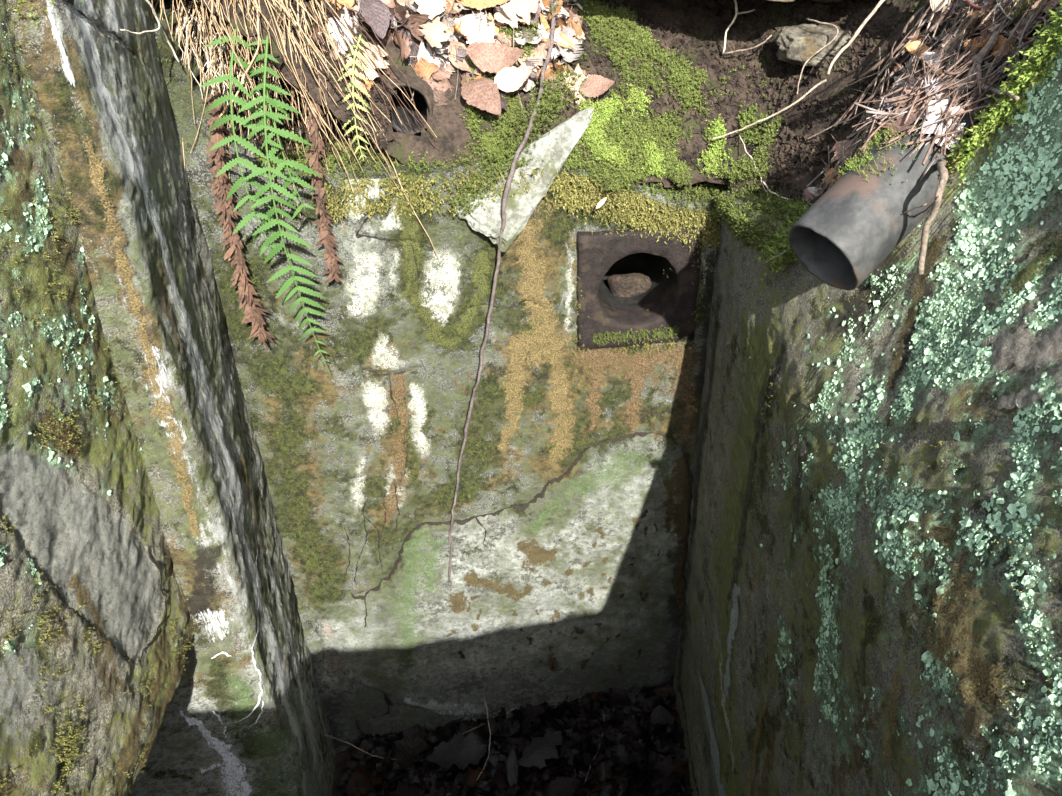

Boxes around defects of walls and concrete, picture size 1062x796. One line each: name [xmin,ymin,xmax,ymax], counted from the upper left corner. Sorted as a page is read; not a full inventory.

damp [47,6,75,86]
damp [407,251,497,350]
damp [84,21,317,759]
crack [325,369,693,628]
damp [180,711,252,796]